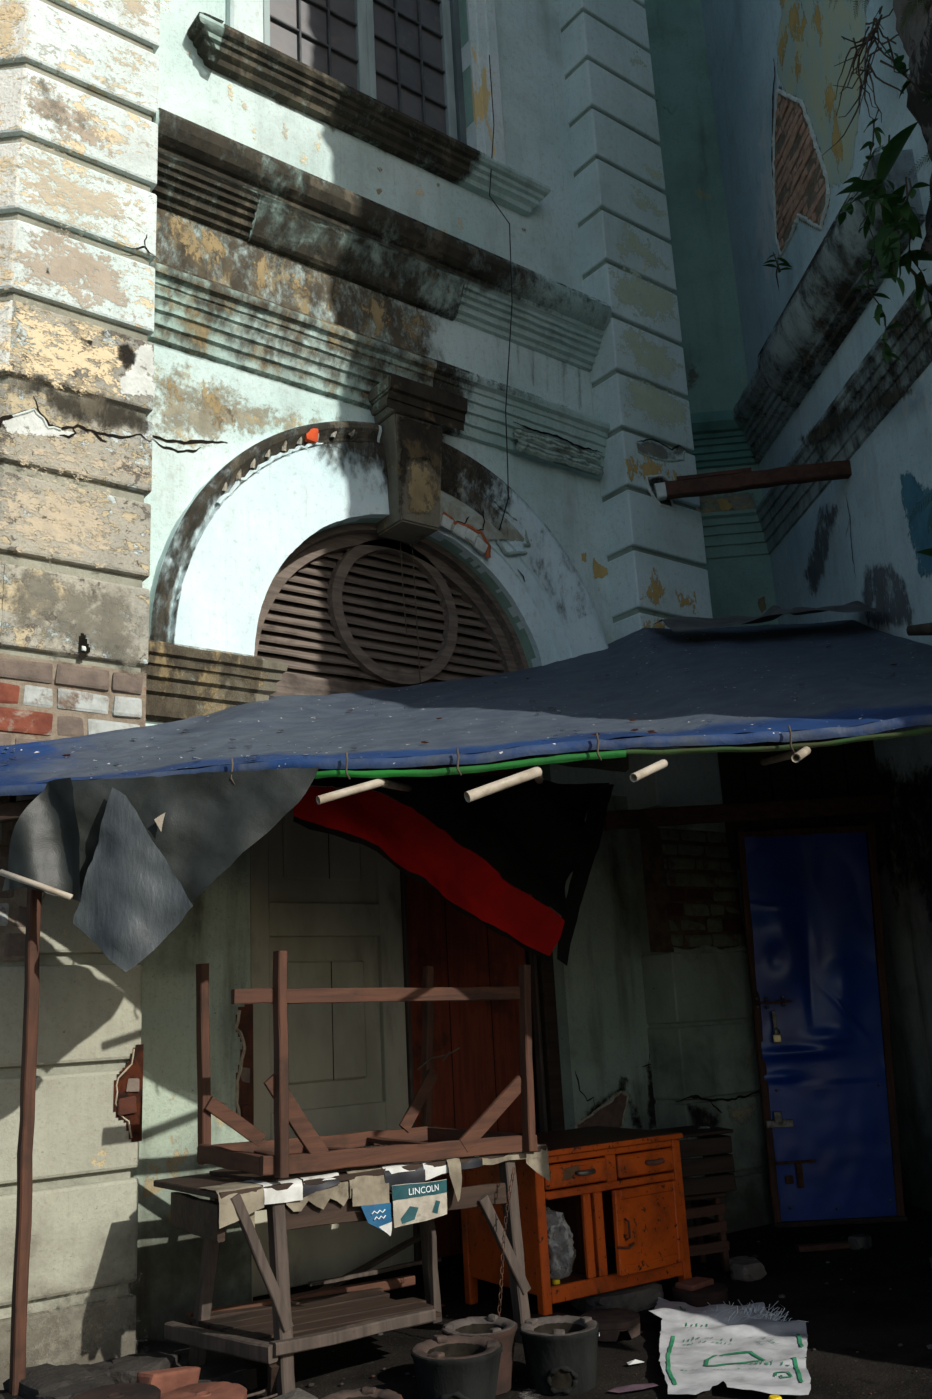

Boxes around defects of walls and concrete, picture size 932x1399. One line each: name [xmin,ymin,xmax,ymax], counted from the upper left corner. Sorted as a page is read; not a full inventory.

peeling [0,74,155,399]
crack [0,396,228,453]
peeling [108,0,170,30]
leakage [142,108,599,723]
spalling [513,421,602,453]
peeling [609,223,691,511]
peeling [772,0,866,258]
leakage [734,144,932,464]
flaking render [0,408,155,746]
flaking render [0,794,39,803]
flaking render [0,821,46,961]
crack [675,1089,760,1113]